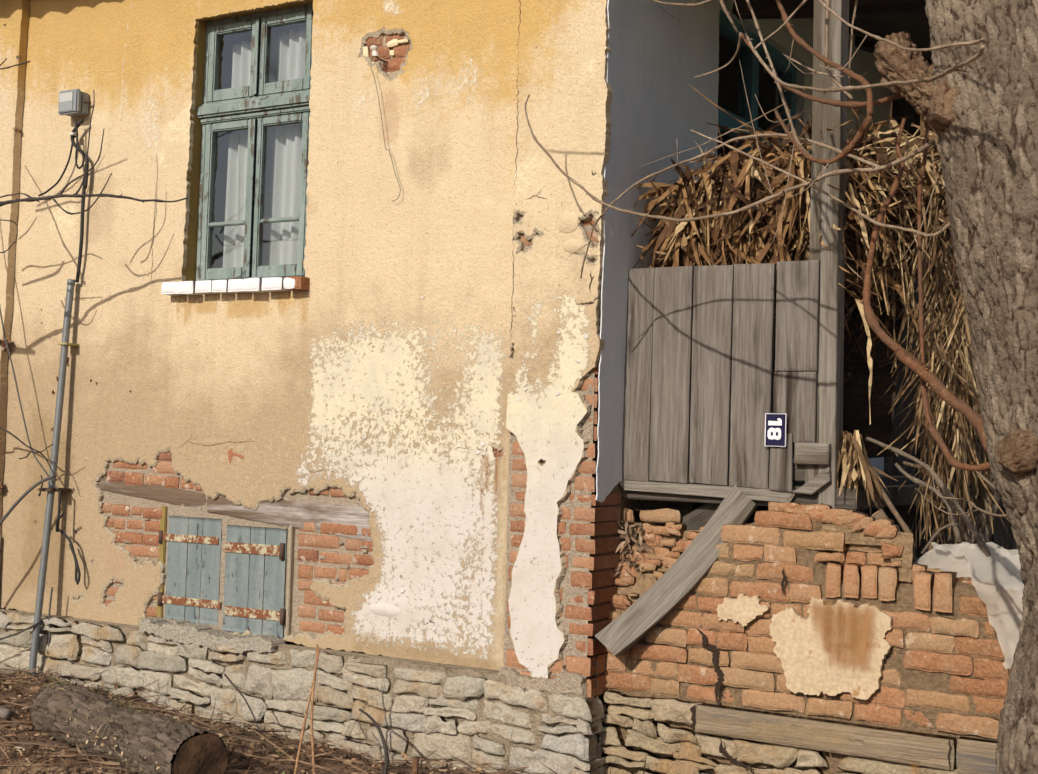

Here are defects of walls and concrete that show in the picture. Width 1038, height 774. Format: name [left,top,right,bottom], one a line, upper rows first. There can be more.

spalling [358,27,413,82]
peeling [92,290,621,697]
crack [690,628,724,732]
crack [719,739,754,774]